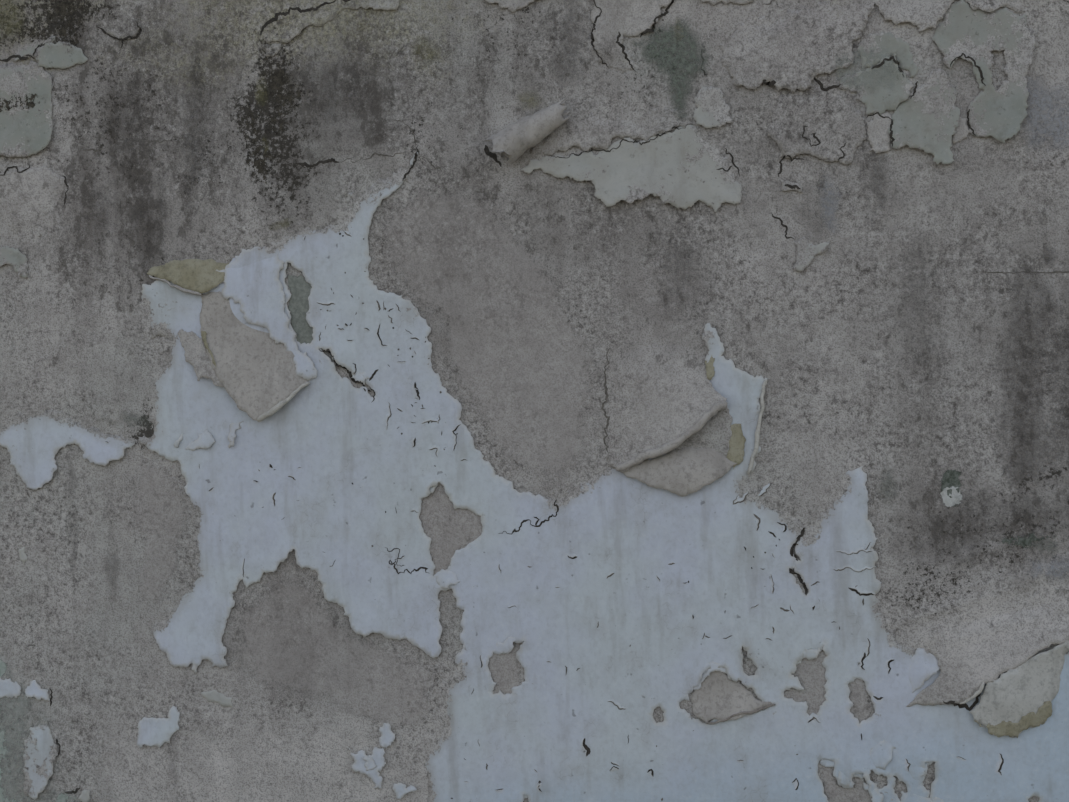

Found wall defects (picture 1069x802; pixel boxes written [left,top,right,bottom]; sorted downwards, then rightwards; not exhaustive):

mould [18,0,102,47]
peeling [261,0,399,57]
peeling [485,0,534,13]
peeling [591,0,672,73]
peeling [0,35,88,237]
mould [238,50,304,188]
peeling [485,86,742,212]
peeling [719,0,1036,165]
peeling [0,409,136,490]
peeling [137,152,1069,802]
peeling [0,677,50,701]
peeling [23,725,58,800]